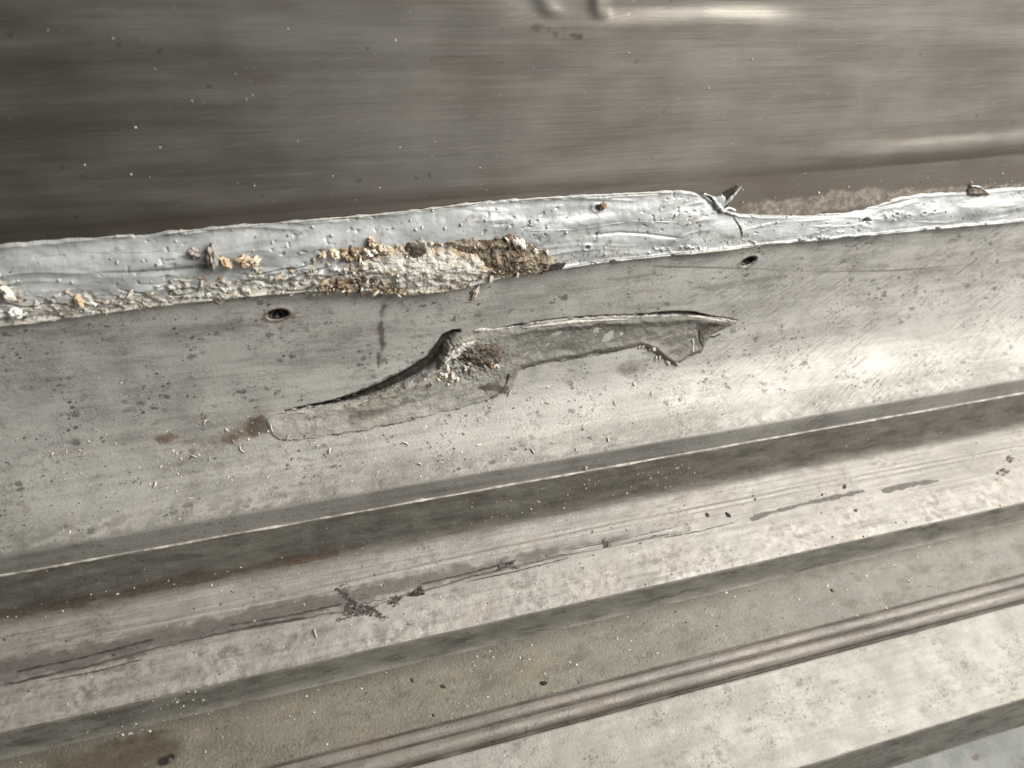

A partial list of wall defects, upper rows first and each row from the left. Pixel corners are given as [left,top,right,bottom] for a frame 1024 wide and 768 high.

spalling [0,234,558,327]
peeling [266,314,736,441]